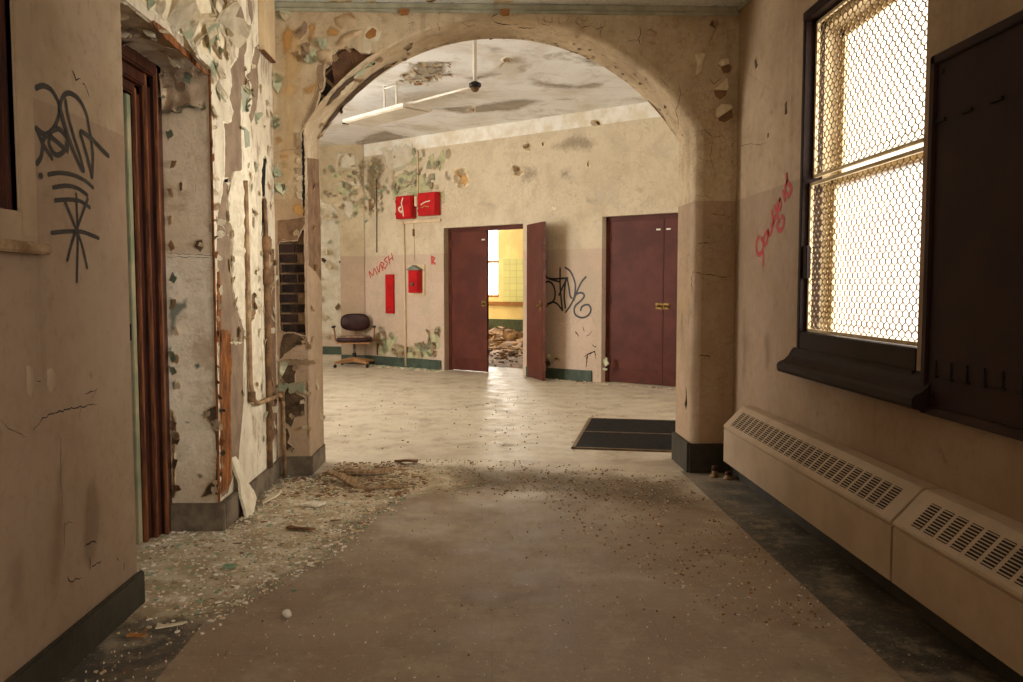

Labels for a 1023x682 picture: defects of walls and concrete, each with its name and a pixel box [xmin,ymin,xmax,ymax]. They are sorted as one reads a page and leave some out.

flaking render [277,10,683,142]
peeling [713,58,734,124]
flaking render [120,0,470,500]
crack [1,389,97,437]